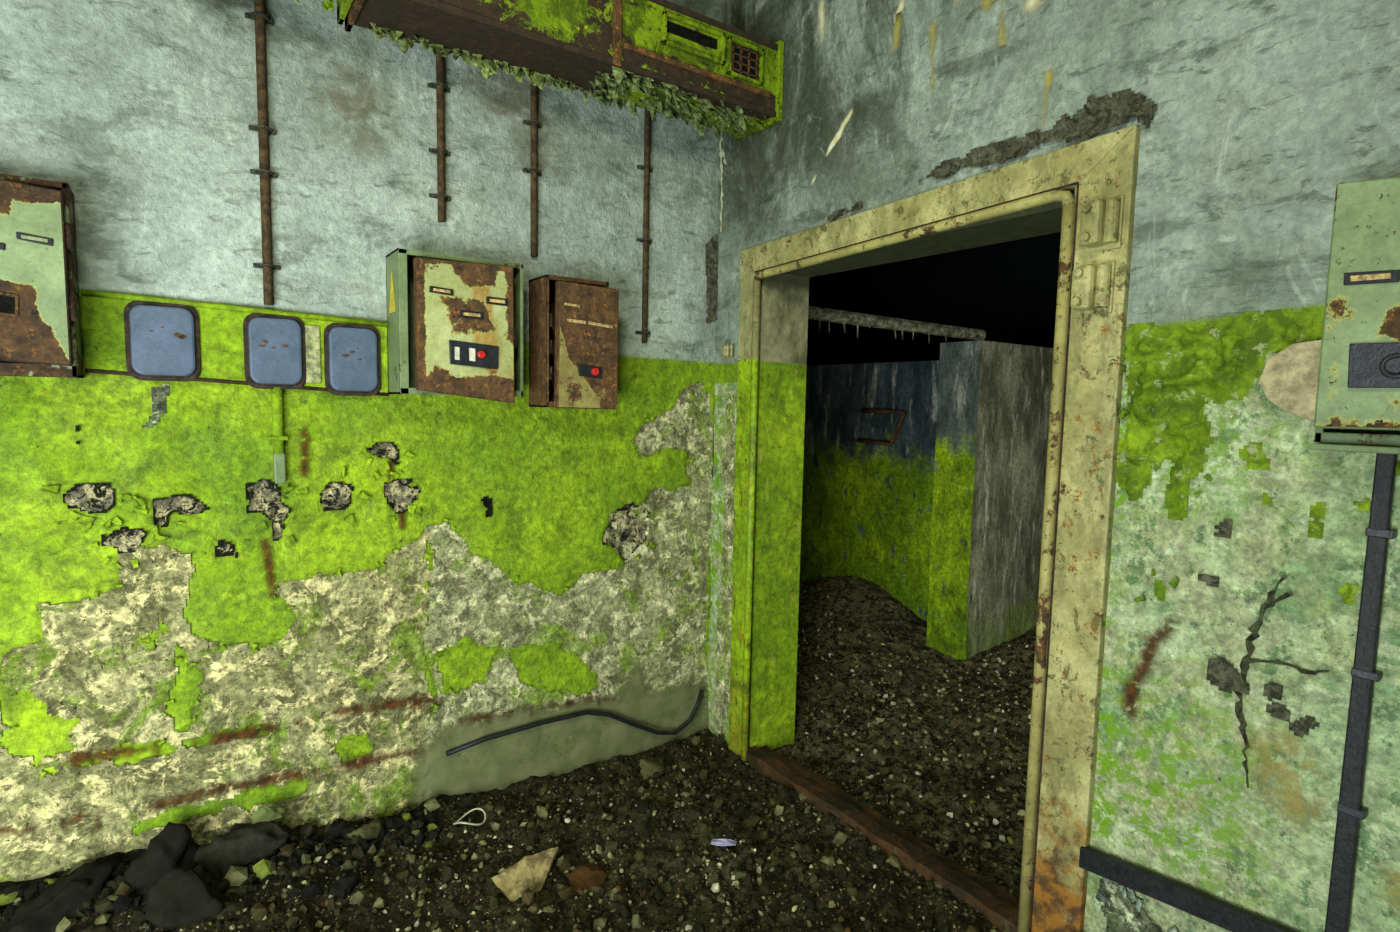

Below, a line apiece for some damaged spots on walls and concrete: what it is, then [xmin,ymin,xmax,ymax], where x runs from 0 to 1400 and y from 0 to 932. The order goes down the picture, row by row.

flaking render [918,88,1157,182]
peeling [0,382,735,882]
corrosion [1124,621,1175,716]
crack [1233,575,1329,788]
corrosion [333,697,441,716]
corrosion [212,724,276,747]
corrosion [68,748,139,764]
corrosion [339,749,423,769]
corrosion [149,770,318,810]